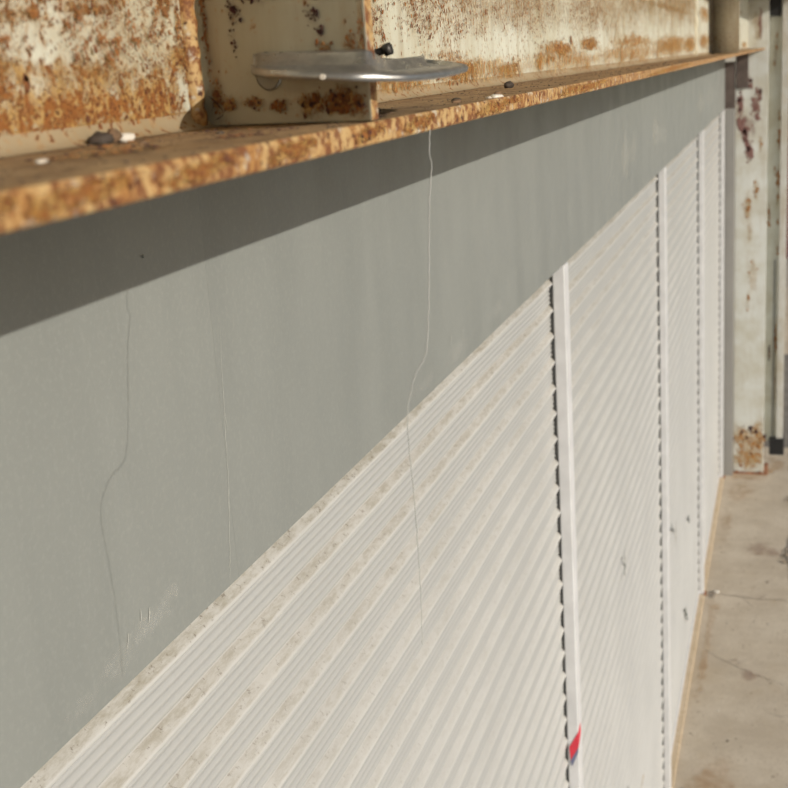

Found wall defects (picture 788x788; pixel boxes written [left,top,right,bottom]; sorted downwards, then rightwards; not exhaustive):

rust [0,0,190,136]
rust [198,0,368,119]
rust [344,0,709,93]
rust [356,114,390,144]
rust [733,423,766,468]